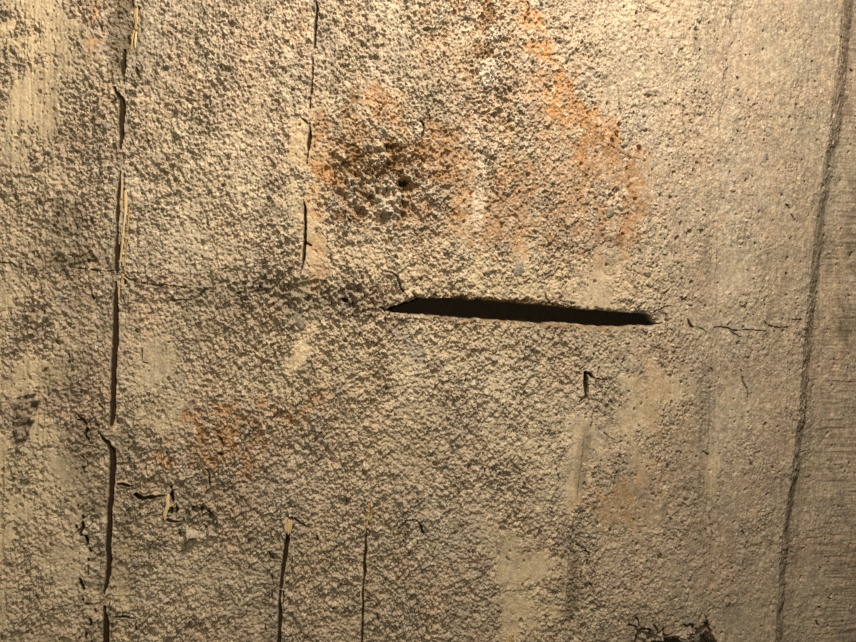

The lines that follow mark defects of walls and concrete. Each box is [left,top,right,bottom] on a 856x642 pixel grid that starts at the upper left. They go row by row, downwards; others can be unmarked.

crack [300,0,319,165]
corrosion [286,0,659,281]
crack [0,261,38,281]
crack [60,49,255,642]
crack [300,199,313,275]
crack [544,289,572,304]
corrosion [145,387,335,482]
crack [264,515,308,642]
crack [358,528,380,642]
spalling [633,617,718,642]